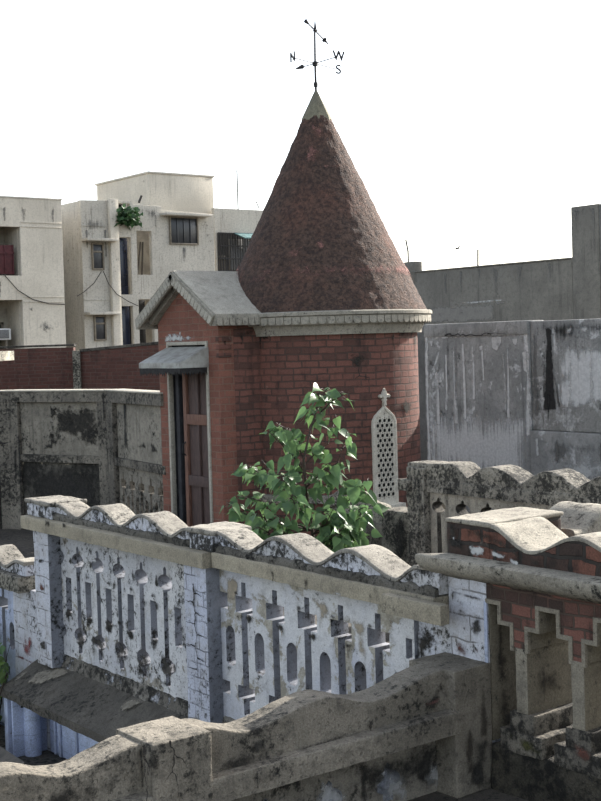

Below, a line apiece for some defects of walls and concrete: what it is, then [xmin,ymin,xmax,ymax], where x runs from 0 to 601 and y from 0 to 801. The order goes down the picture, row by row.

water stain [45,394,106,448]
water stain [432,344,523,469]
water stain [533,324,577,417]
crack [186,584,204,673]
crack [142,740,187,801]